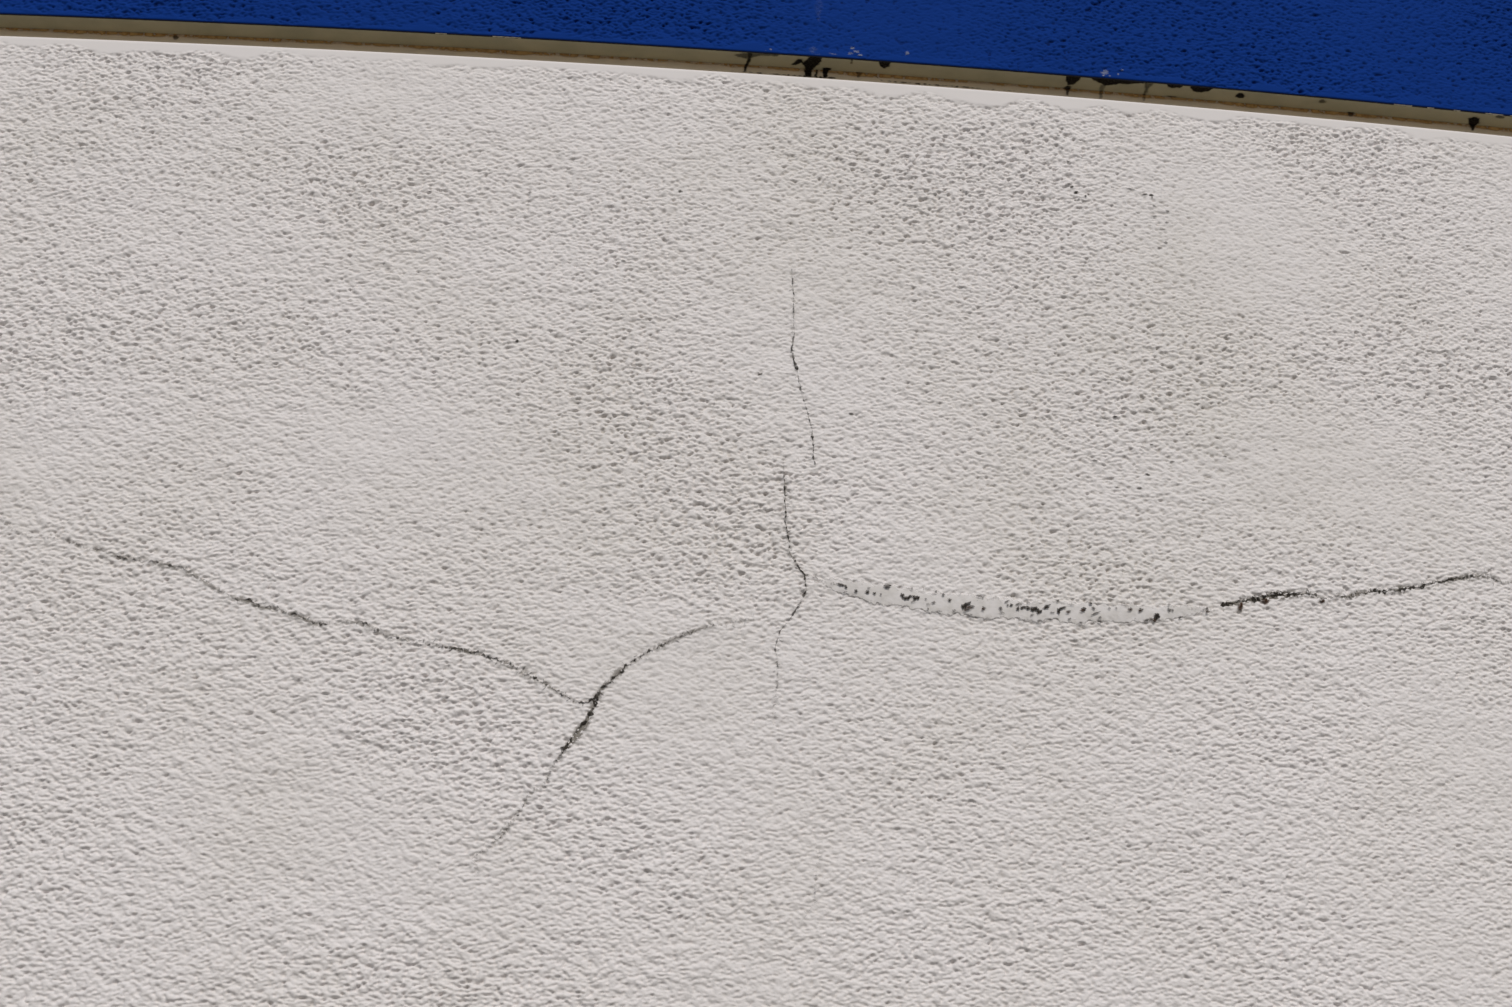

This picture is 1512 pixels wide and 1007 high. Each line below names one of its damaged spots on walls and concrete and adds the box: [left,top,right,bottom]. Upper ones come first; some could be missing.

crack [111,552,714,840]
crack [774,279,815,653]
crack [1220,574,1496,607]